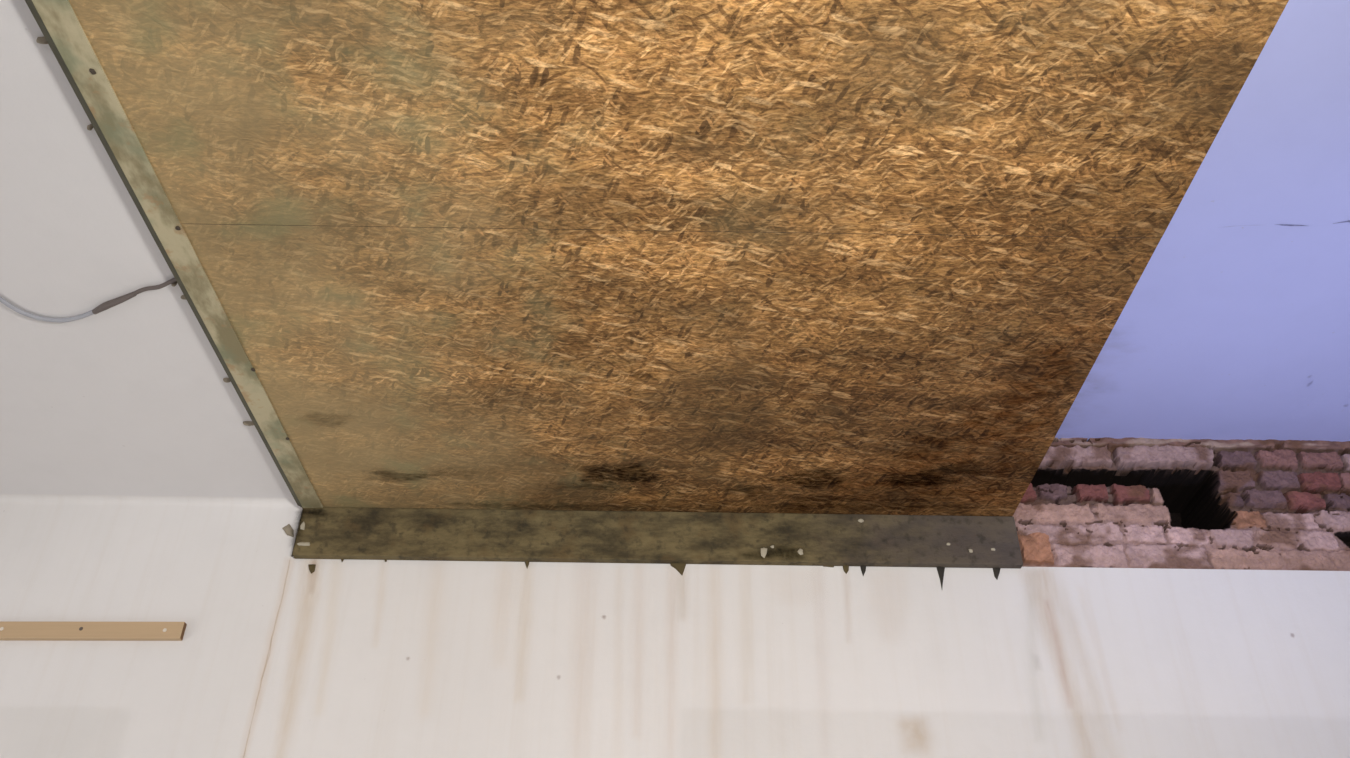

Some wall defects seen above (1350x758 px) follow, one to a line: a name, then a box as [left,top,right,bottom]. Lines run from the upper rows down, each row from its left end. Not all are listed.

damp [588,466,654,482]
flaking render [1012,437,1350,571]